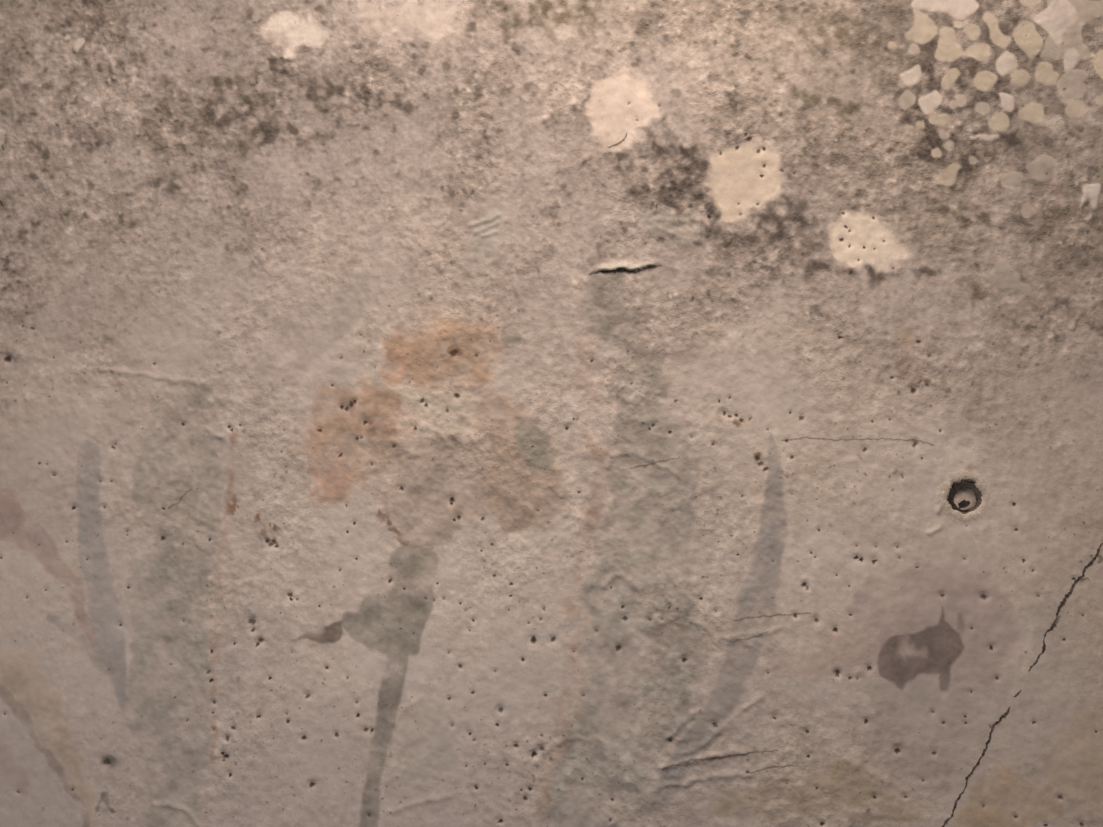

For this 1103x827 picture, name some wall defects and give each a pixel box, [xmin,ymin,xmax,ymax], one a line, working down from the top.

peeling [264,11,328,58]
peeling [586,69,660,150]
peeling [899,0,1103,187]
water stain [0,0,1103,447]
peeling [707,132,796,222]
peeling [830,211,907,274]
peeling [1080,184,1101,210]
crack [941,543,1103,827]